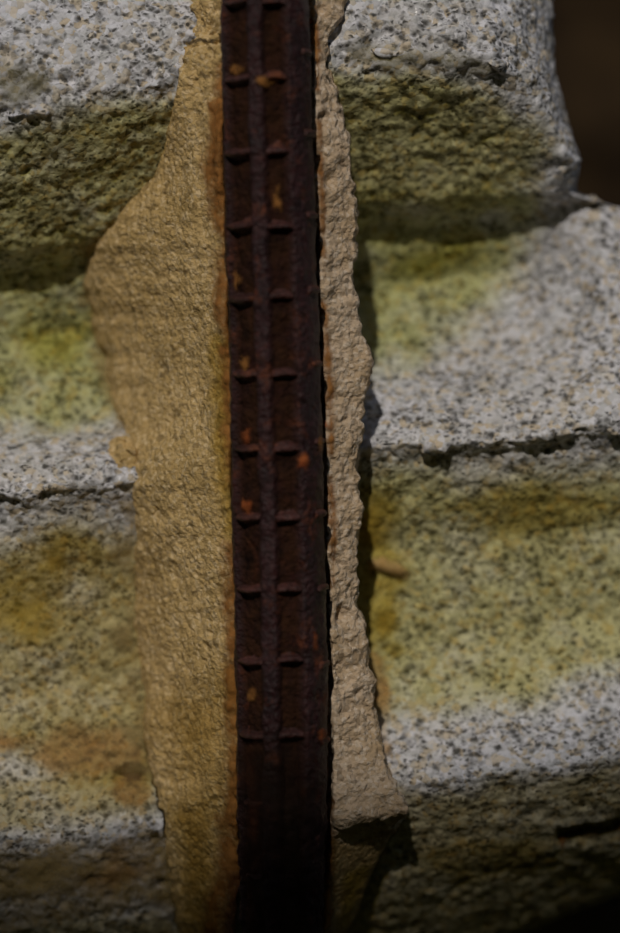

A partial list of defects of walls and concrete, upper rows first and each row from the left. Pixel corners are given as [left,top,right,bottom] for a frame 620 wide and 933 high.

corrosion [308,0,321,91]
corrosion [205,65,238,236]
corrosion [214,249,240,466]
corrosion [319,304,334,401]